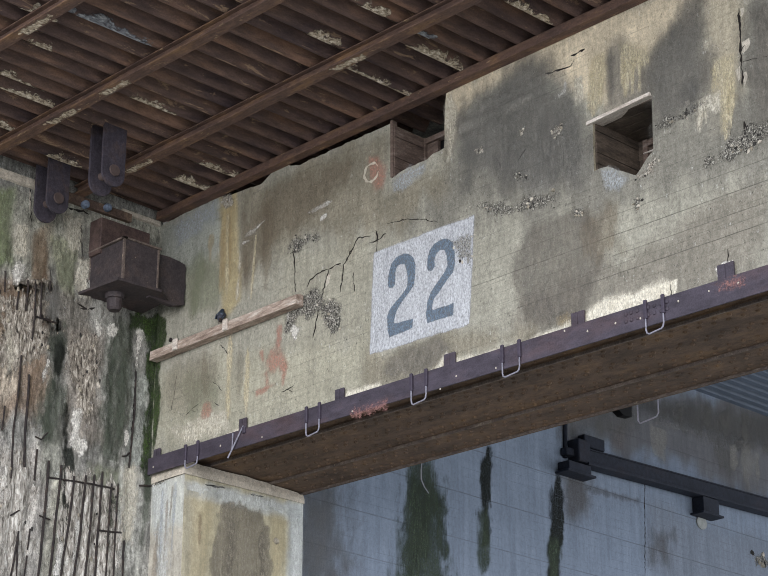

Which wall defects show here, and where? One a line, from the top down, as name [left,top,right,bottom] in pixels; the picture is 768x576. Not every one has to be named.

damp [574,53,607,116]
crack [735,8,766,87]
damp [446,95,506,163]
spalling [703,119,768,169]
spalling [283,285,342,337]
crack [290,219,437,336]
spalling [0,271,126,576]
spalling [122,371,137,468]
damp [210,491,286,576]
damp [405,471,449,576]
damp [477,508,490,572]
damp [547,538,562,576]